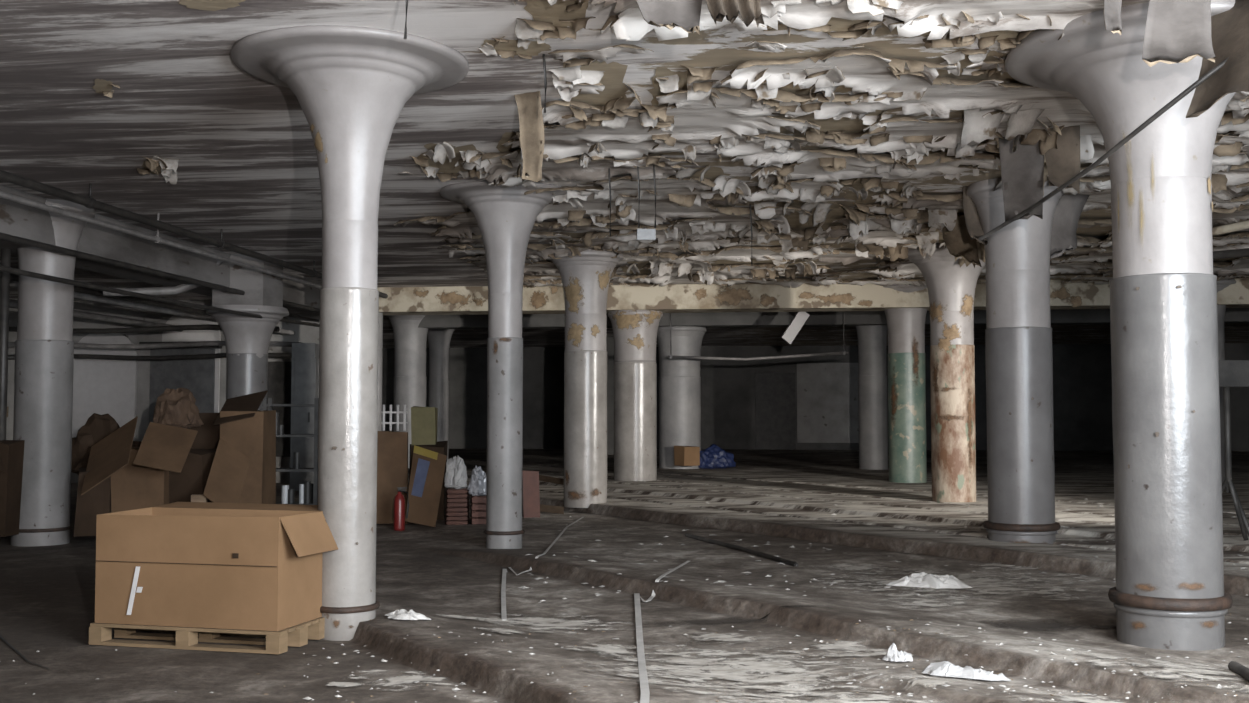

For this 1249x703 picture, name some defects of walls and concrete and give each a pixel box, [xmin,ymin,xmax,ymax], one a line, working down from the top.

peeling [394,0,1249,351]
corrosion [933,365,972,468]